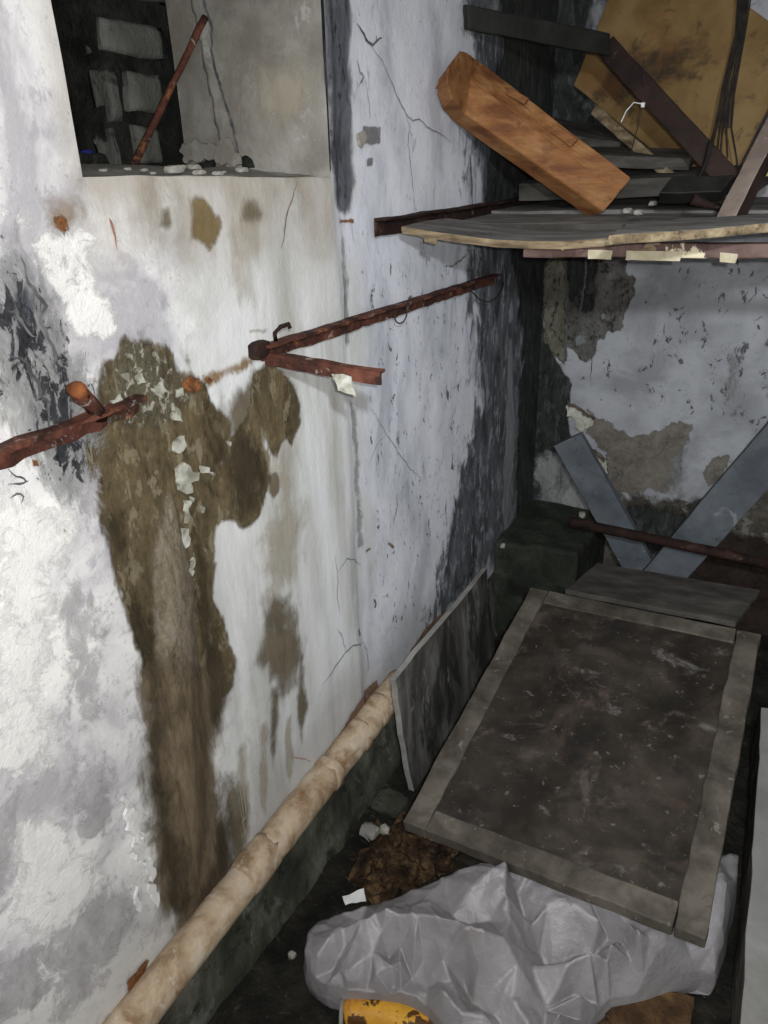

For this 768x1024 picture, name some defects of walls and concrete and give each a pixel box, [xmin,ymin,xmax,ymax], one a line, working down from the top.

crack [357,24,449,194]
leakage [471,31,625,129]
leakage [459,129,534,204]
leakage [192,197,221,249]
flaking render [542,257,652,400]
corrosion [0,381,148,470]
flaking render [120,372,184,422]
leakage [426,245,590,627]
flaking render [566,402,595,432]
spalling [708,342,749,416]
flaking render [172,435,214,576]
leakage [0,251,308,931]